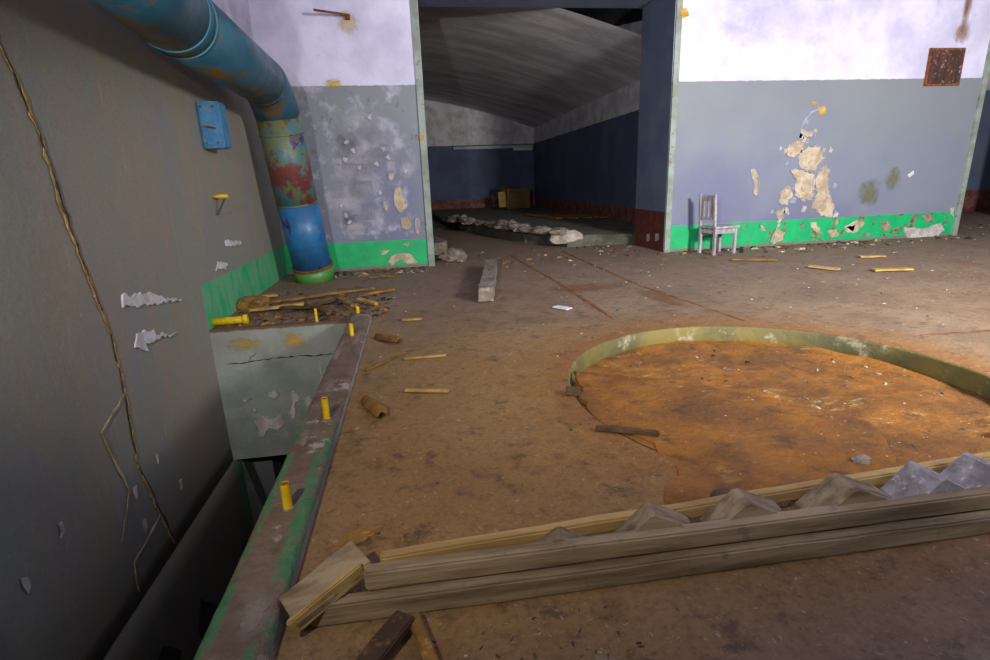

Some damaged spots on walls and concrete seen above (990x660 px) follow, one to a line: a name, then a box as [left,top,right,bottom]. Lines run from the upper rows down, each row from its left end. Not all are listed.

rust [957,0,971,37]
peeling [334,114,420,235]
peeling [750,168,759,196]
peeling [759,120,870,246]
peeling [903,215,944,238]
peeling [381,243,418,266]
crack [227,353,333,365]
peeling [238,390,313,446]